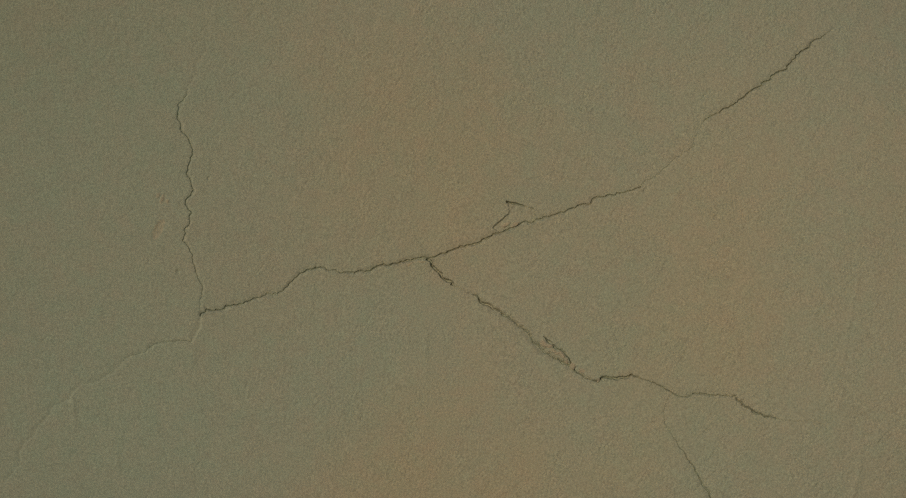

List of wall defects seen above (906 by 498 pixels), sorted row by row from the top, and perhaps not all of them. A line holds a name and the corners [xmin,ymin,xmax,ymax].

crack [0,0,425,494]
crack [419,0,895,438]